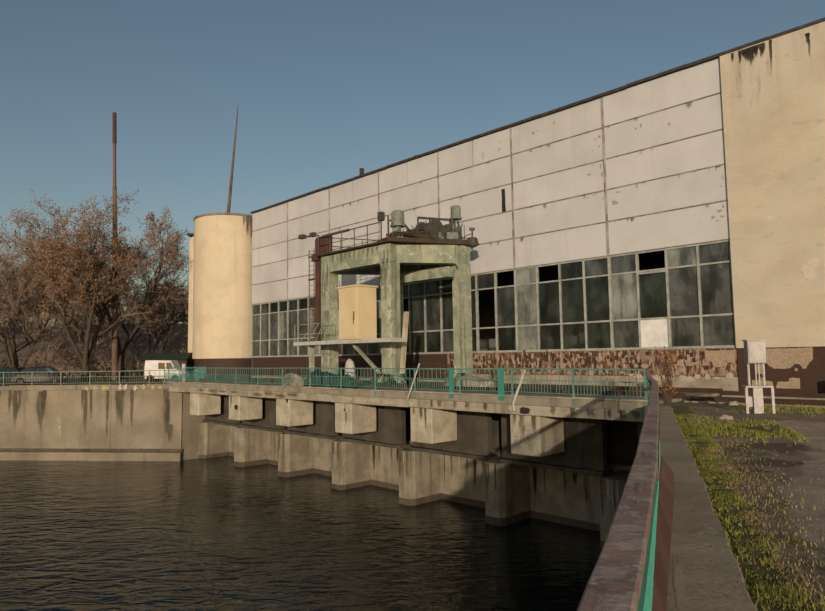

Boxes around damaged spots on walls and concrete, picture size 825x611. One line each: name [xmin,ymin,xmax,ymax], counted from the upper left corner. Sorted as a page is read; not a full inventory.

leakage [731,39,772,63]
spalling [752,347,813,389]
leakage [8,390,21,419]
leakage [37,390,47,419]
leakage [81,390,92,426]
leakage [106,389,133,419]
leakage [372,445,407,474]